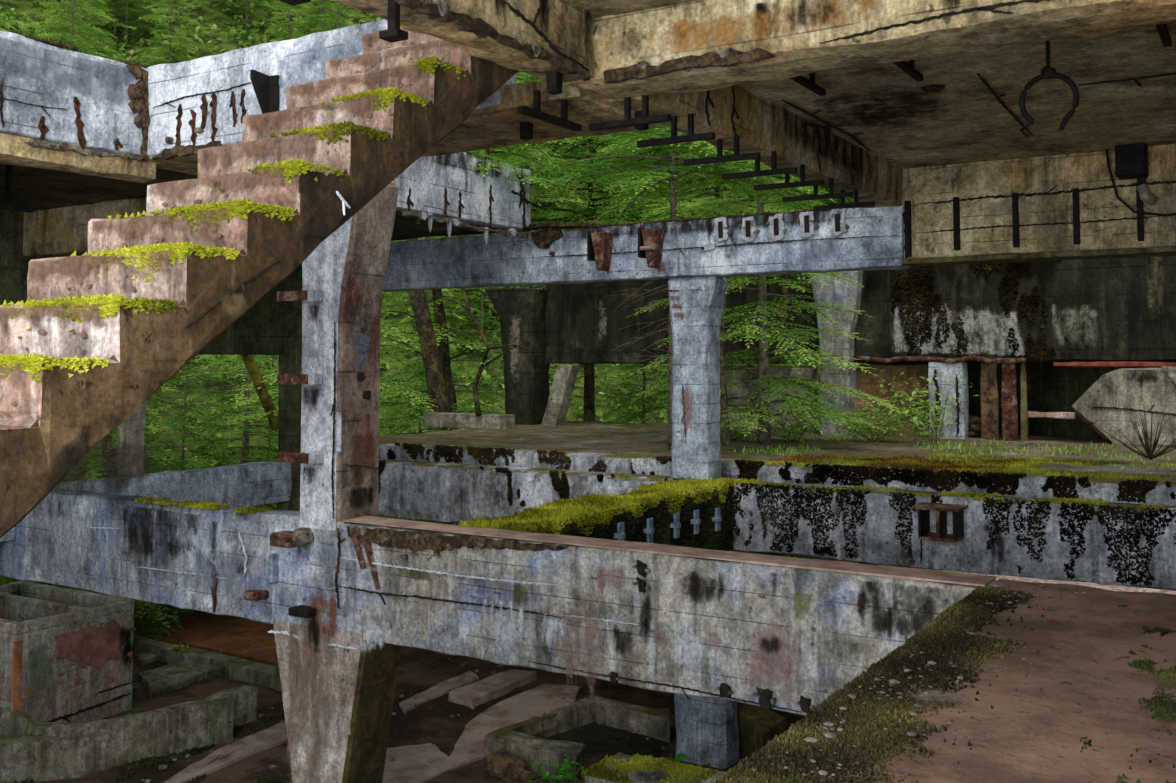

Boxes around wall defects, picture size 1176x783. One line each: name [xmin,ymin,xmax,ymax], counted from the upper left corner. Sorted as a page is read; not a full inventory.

spalling [392,0,776,84]
crack [820,0,1049,44]
peeling [24,31,454,292]
spalling [402,210,563,256]
peeling [0,304,100,339]
leakage [894,305,1024,355]
leakage [969,261,1097,343]
leakage [985,525,1004,561]
peeling [54,618,133,685]